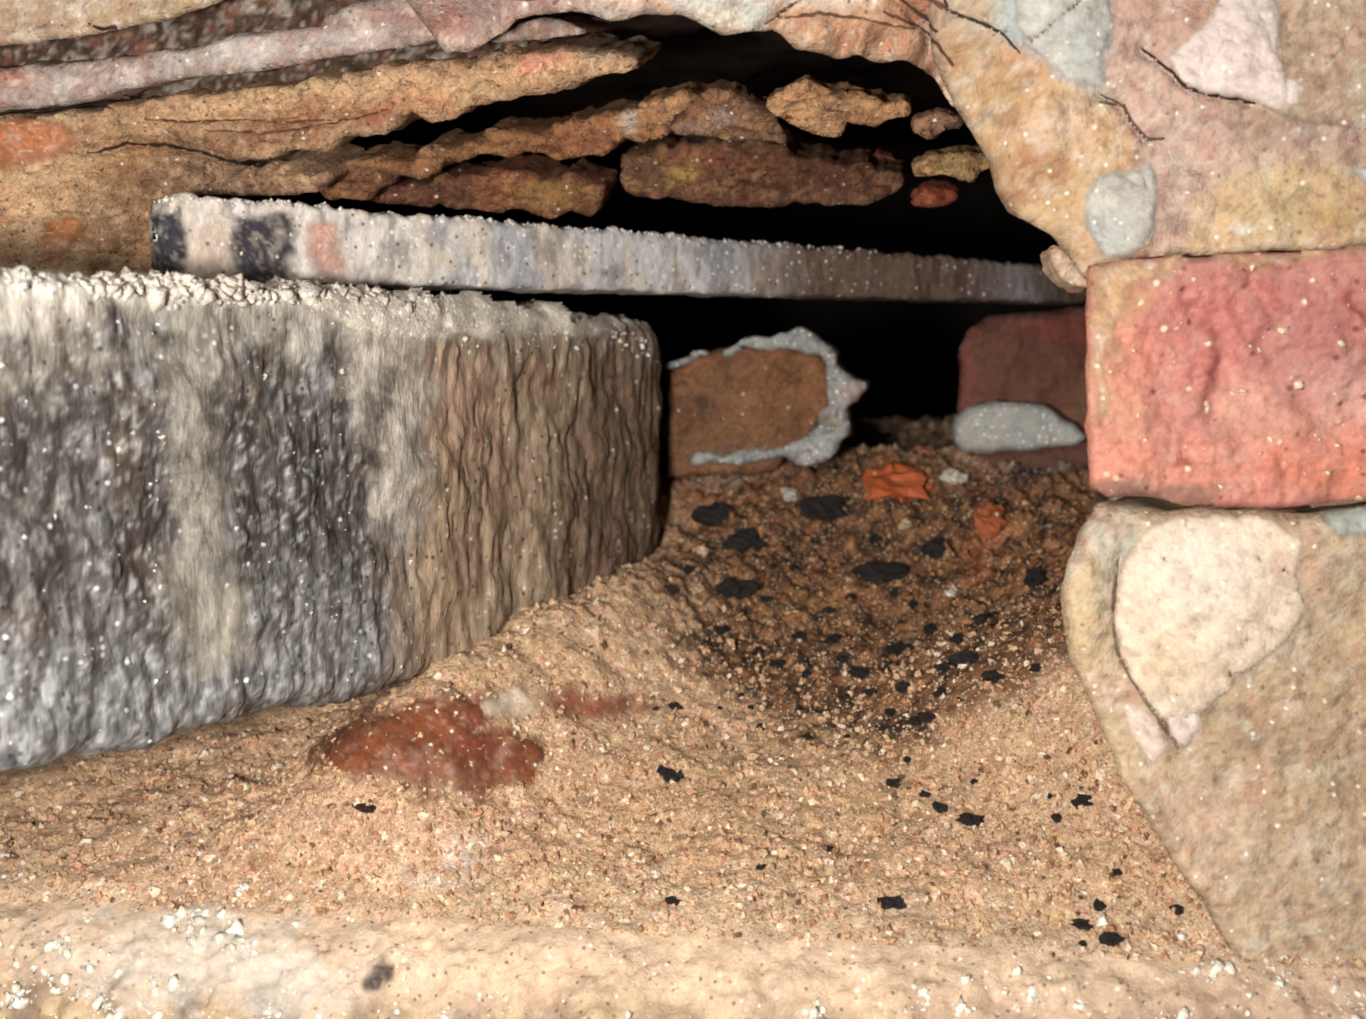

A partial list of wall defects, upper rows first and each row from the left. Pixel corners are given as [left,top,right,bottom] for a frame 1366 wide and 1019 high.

crack [0,0,535,168]
crack [763,0,1020,66]